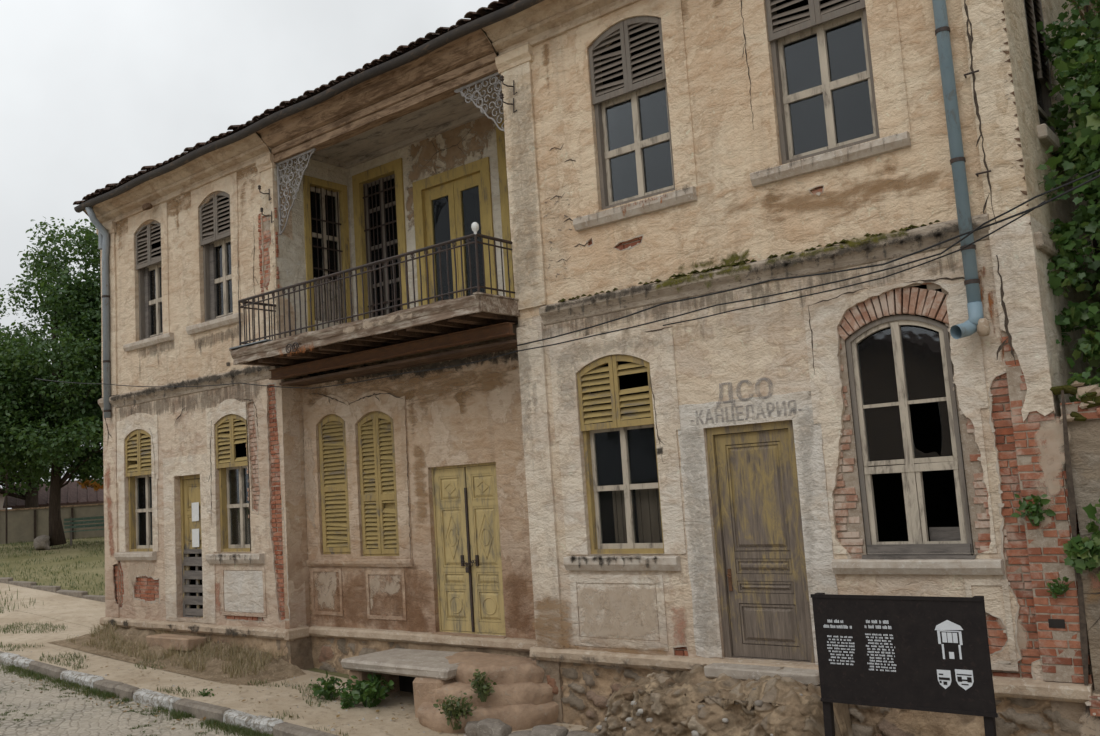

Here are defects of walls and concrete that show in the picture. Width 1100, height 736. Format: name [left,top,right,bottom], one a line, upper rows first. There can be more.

crack [964,0,996,222]
flaking render [258,189,280,301]
damp [763,167,937,213]
crack [906,255,1016,365]
flaking render [834,281,950,559]
flaking render [245,383,290,622]
flaking render [952,331,1100,717]
flaking render [114,560,160,609]
flaking render [226,611,265,623]
peeling [315,572,336,609]
peeling [370,575,400,608]